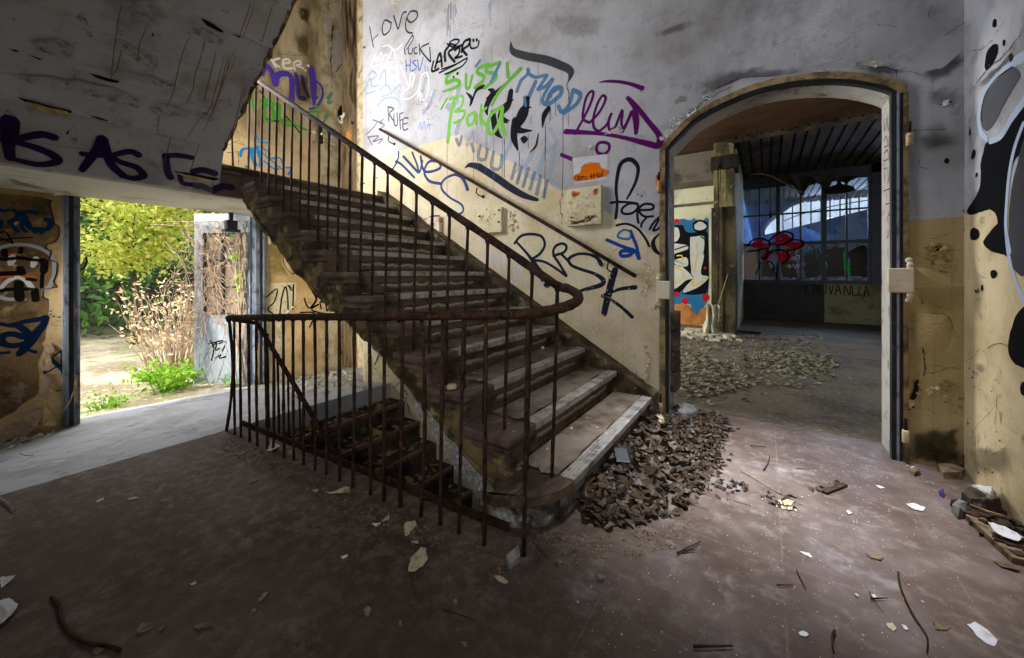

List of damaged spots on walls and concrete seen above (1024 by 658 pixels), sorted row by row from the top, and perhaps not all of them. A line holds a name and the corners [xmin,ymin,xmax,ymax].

water stain [297,8,324,53]
water stain [298,78,309,100]
peeling [660,110,697,140]
flaking render [0,191,72,419]
crack [909,300,1021,376]
water stain [916,430,956,460]